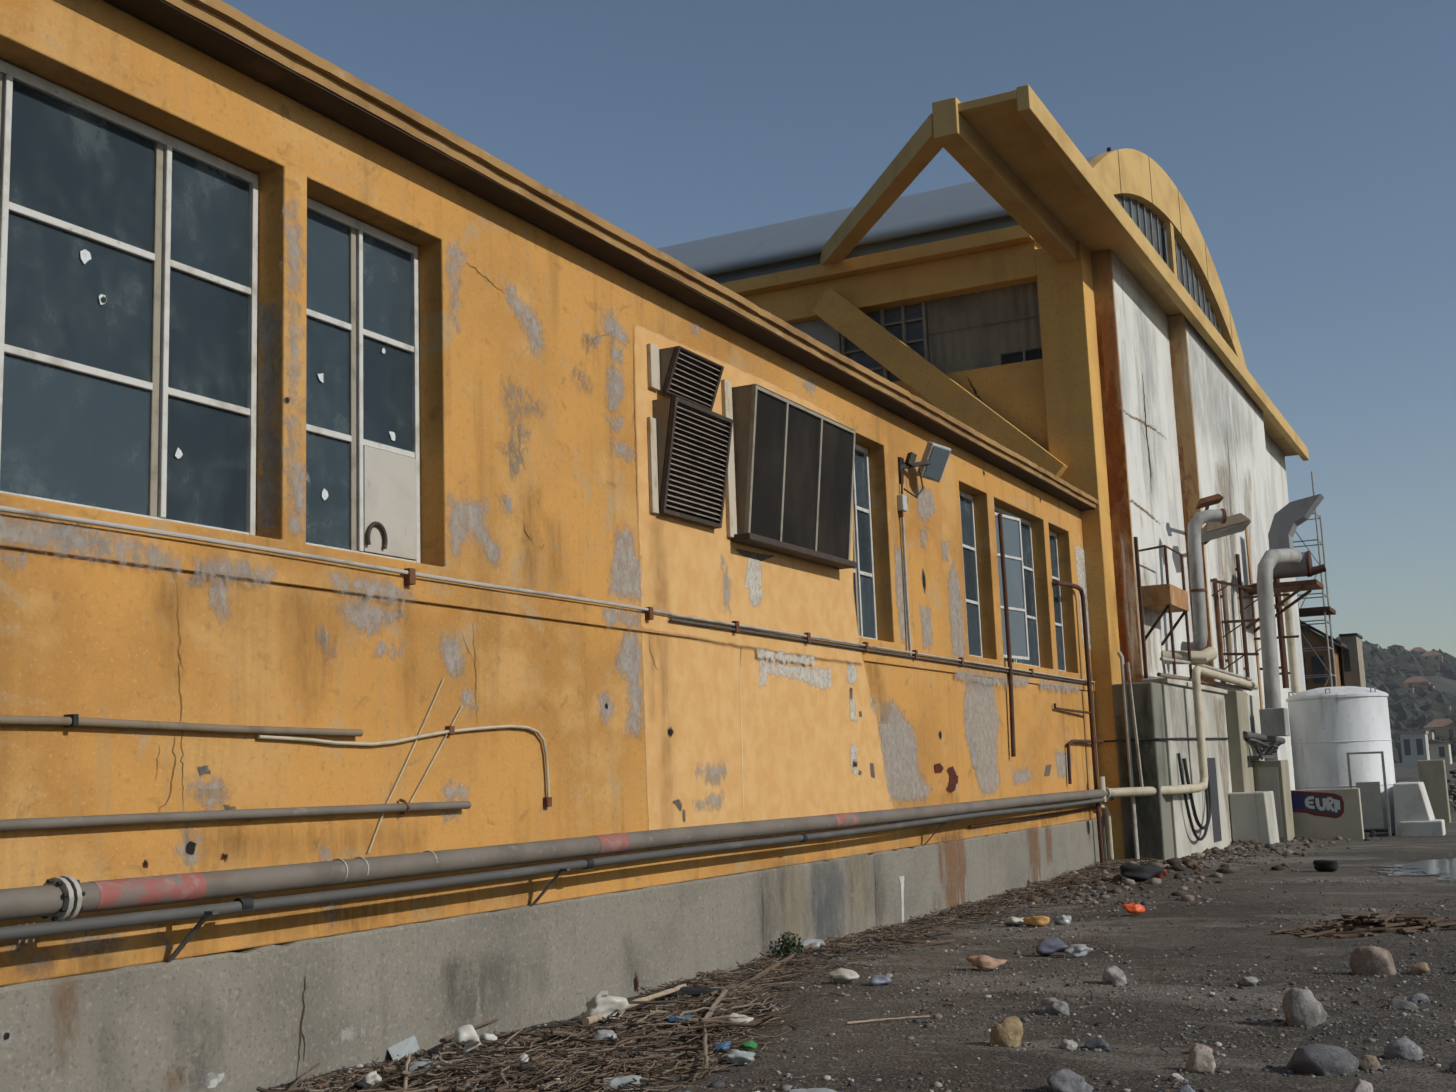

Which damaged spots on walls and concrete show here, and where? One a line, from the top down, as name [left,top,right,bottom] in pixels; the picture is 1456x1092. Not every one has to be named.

peeling [508,286,543,354]
peeling [450,497,512,564]
rust [1097,334,1140,681]
peeling [600,530,643,734]
peeling [895,549,933,647]
peeling [918,485,1079,795]
crack [155,588,184,811]
peeling [757,648,932,801]
rust [934,763,958,793]
rust [940,833,965,909]
crack [296,976,306,1080]